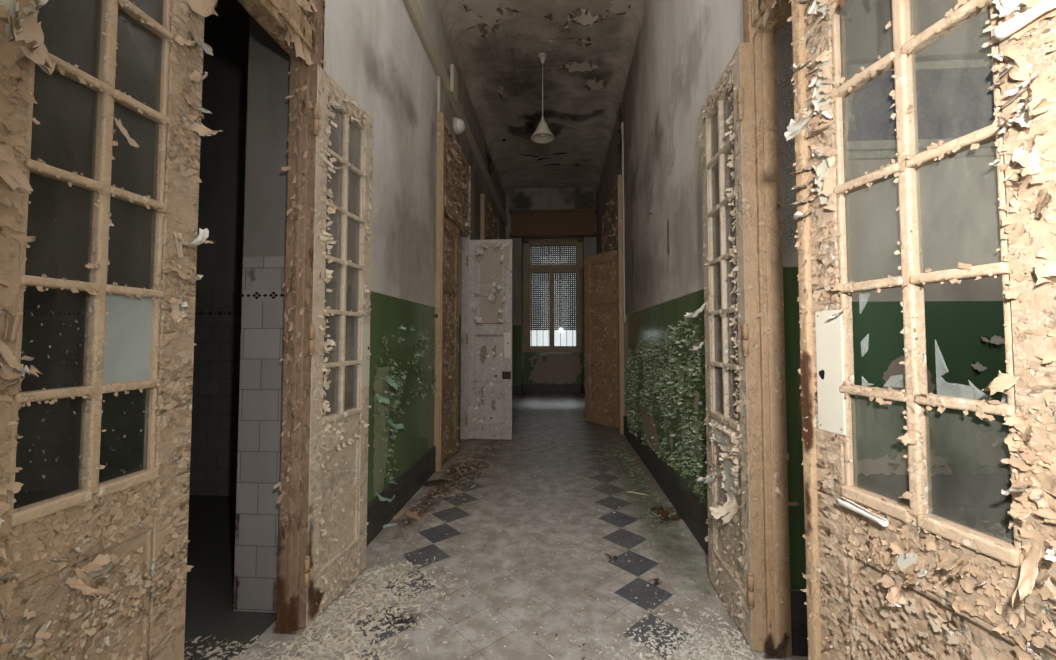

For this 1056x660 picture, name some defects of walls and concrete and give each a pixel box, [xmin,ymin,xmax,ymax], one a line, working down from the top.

peeling [544,0,631,46]
peeling [559,60,607,91]
water stain [510,110,602,136]
peeling [266,0,512,618]
peeling [528,353,583,384]
peeling [387,463,683,660]